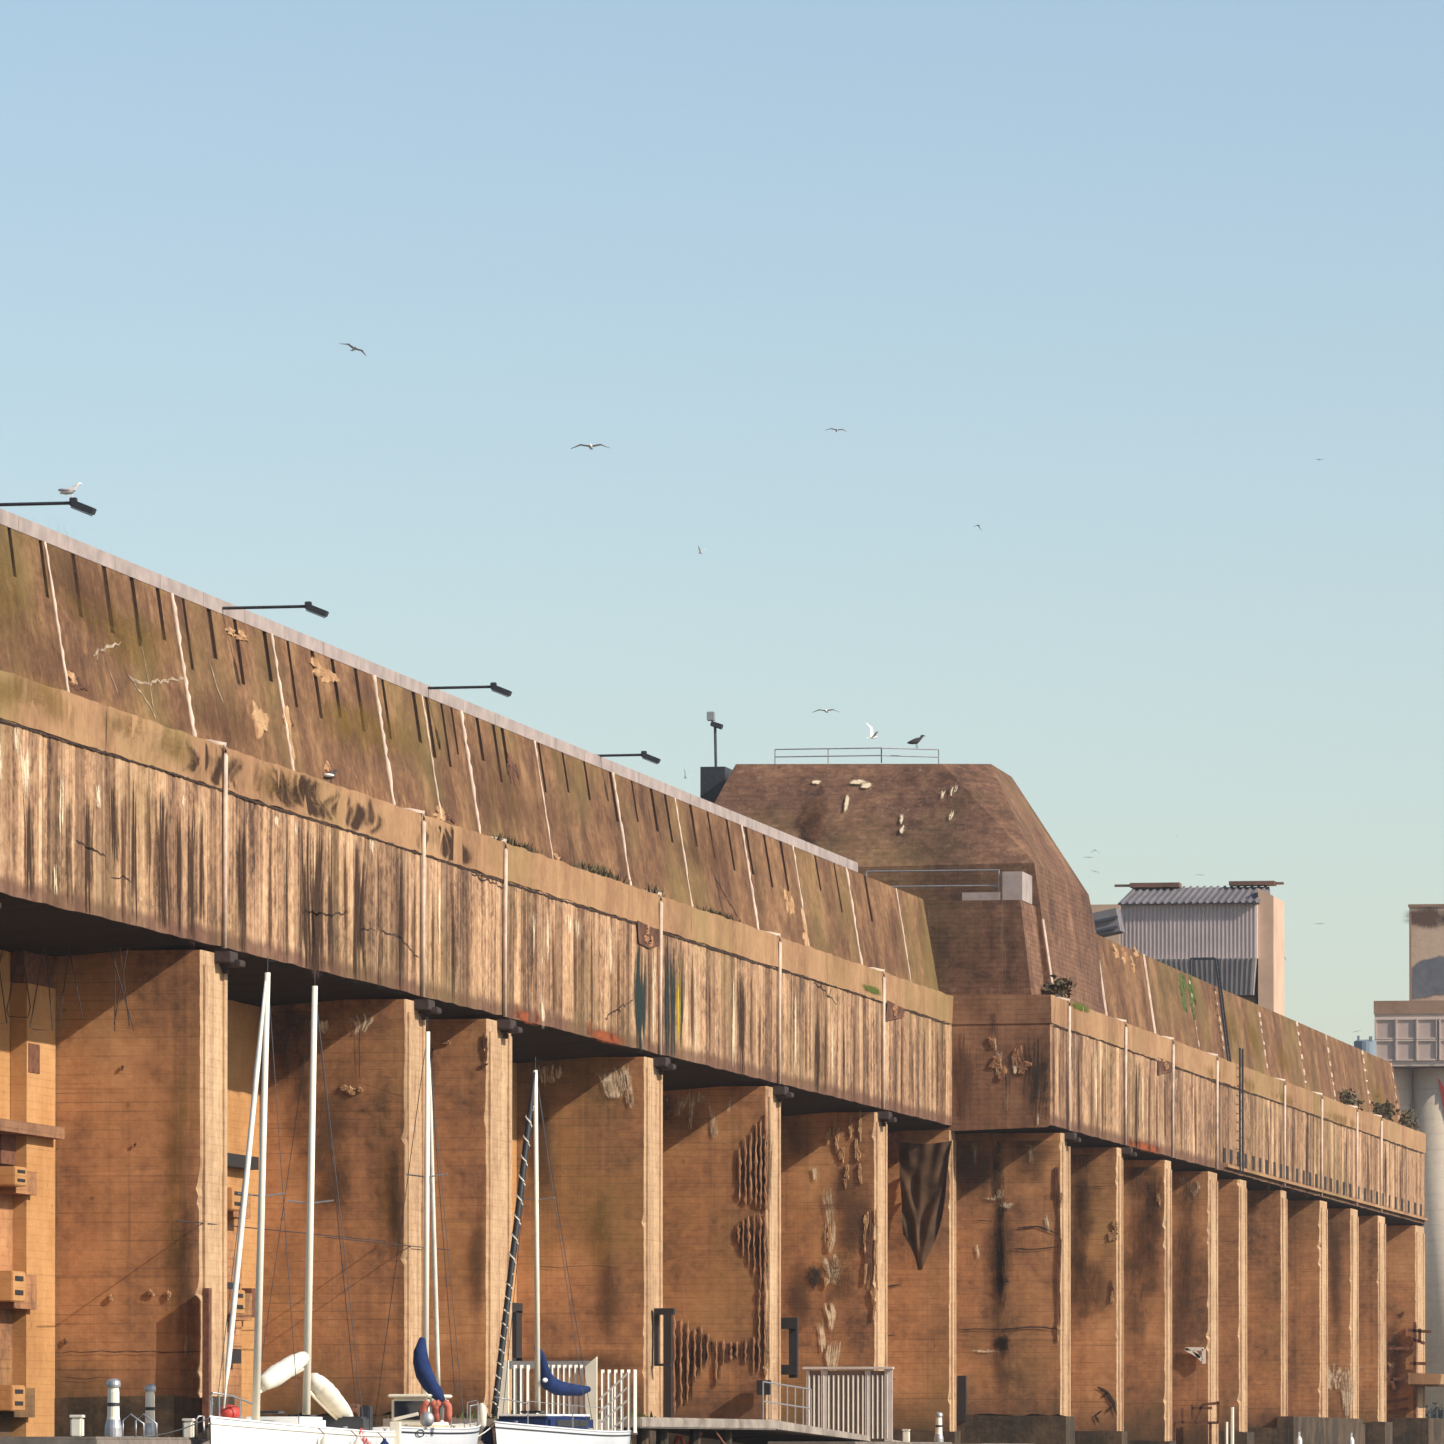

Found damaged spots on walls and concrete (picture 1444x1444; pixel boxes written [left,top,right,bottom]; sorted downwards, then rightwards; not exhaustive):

spalling [251,700,295,763]
water stain [0,728,35,894]
water stain [54,781,204,945]
water stain [238,821,248,954]
water stain [269,769,469,1001]
crack [0,641,951,1025]
spalling [353,1013,373,1033]
water stain [609,932,710,1056]
water stain [794,1008,855,1100]
spalling [987,1037,1032,1081]
spalling [817,1110,862,1371]
spalling [863,1208,879,1321]